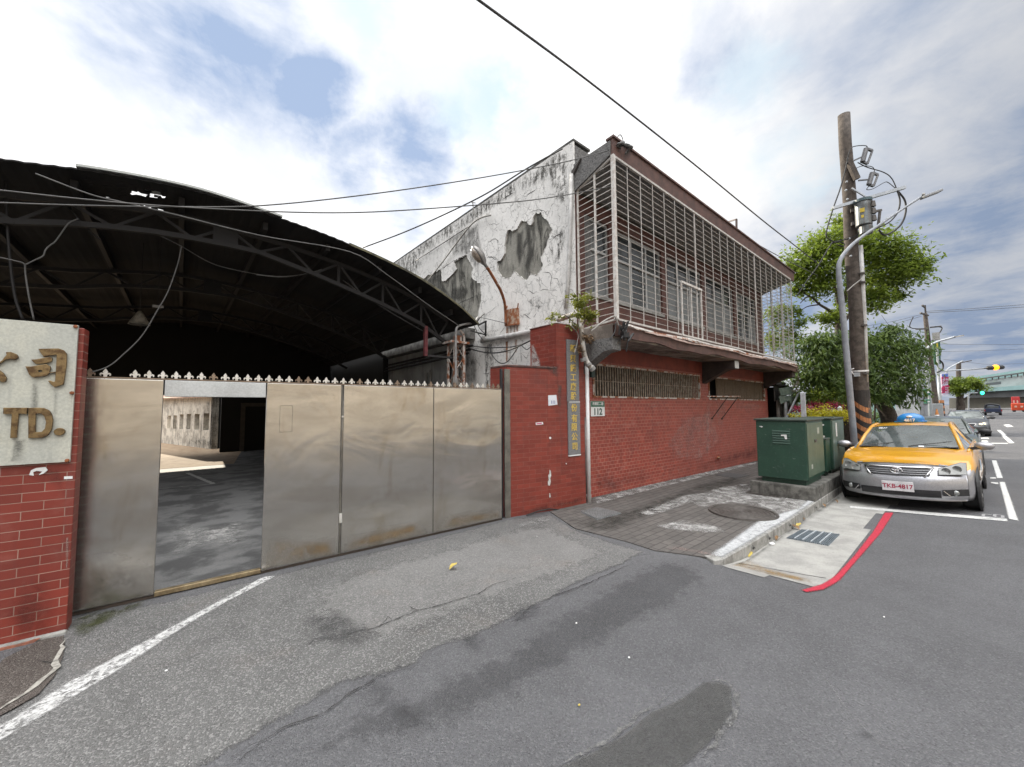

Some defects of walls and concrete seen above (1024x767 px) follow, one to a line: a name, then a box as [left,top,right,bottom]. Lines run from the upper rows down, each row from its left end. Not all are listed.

flaking render [425,254,481,319]
leakage [397,154,565,271]
crack [459,210,562,332]
flaking render [497,212,553,280]